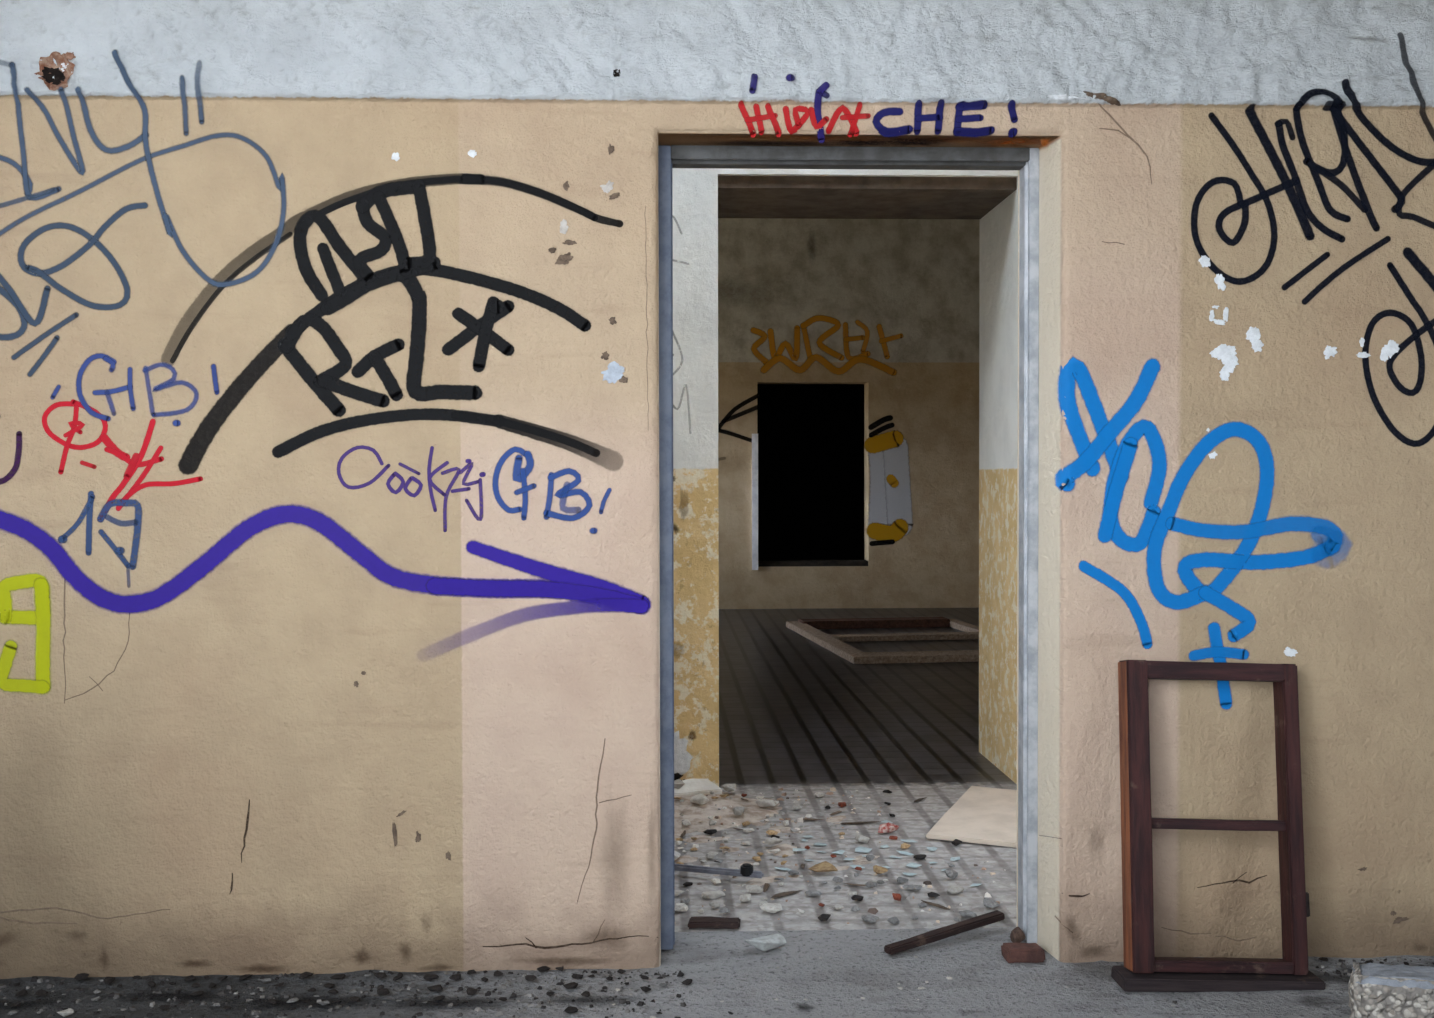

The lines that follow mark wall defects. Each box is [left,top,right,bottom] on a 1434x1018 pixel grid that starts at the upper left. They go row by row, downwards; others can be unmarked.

crack [483,739,658,949]
peeling [674,731,696,780]